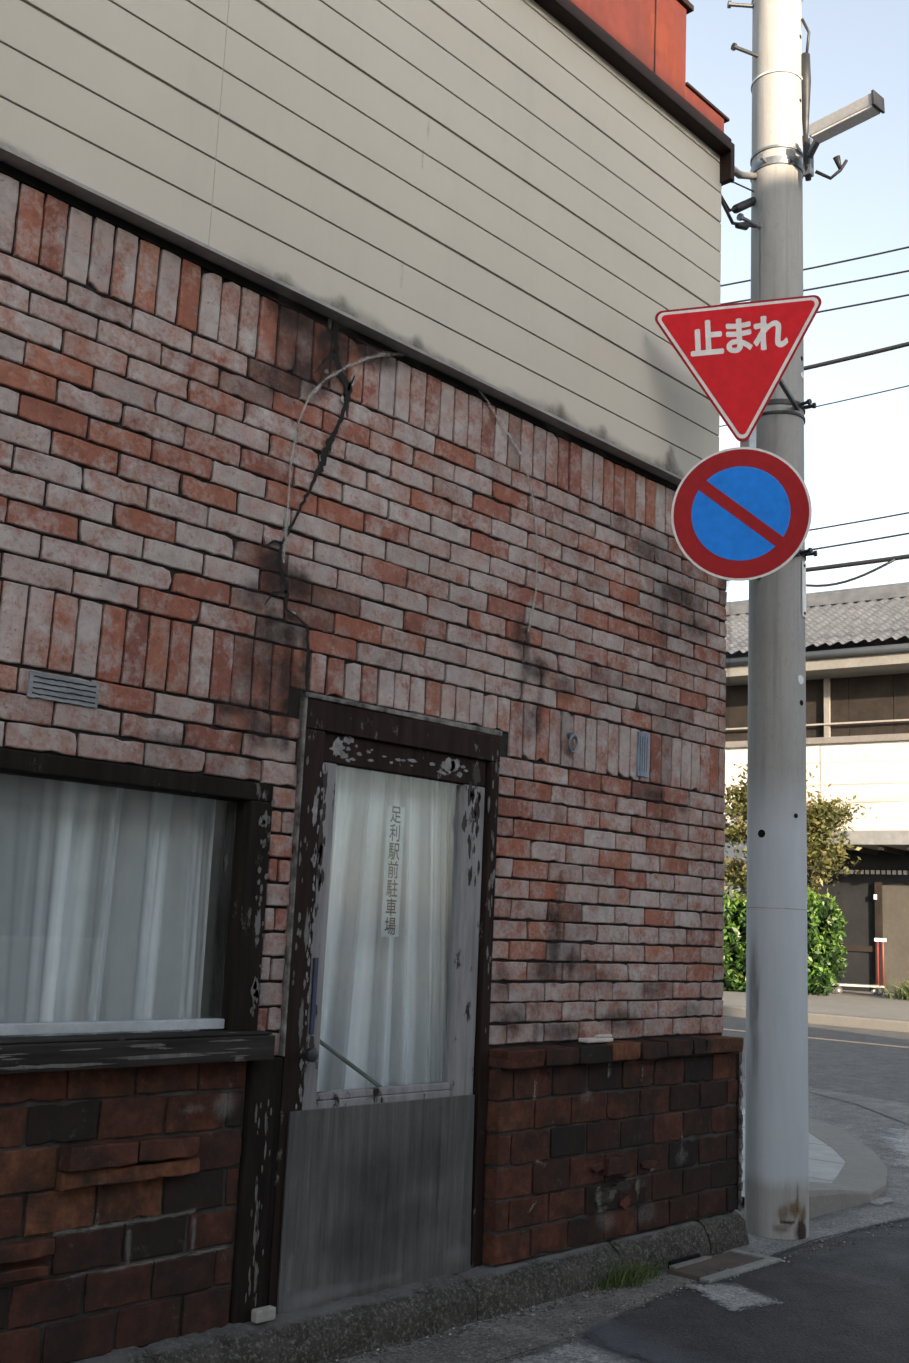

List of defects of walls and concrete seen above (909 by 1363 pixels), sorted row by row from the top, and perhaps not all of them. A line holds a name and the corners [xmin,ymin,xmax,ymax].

crack [264,318,405,697]
crack [477,388,538,632]
peeling [292,736,499,1109]
peeling [0,1039,253,1070]
rust [780,1204,806,1239]